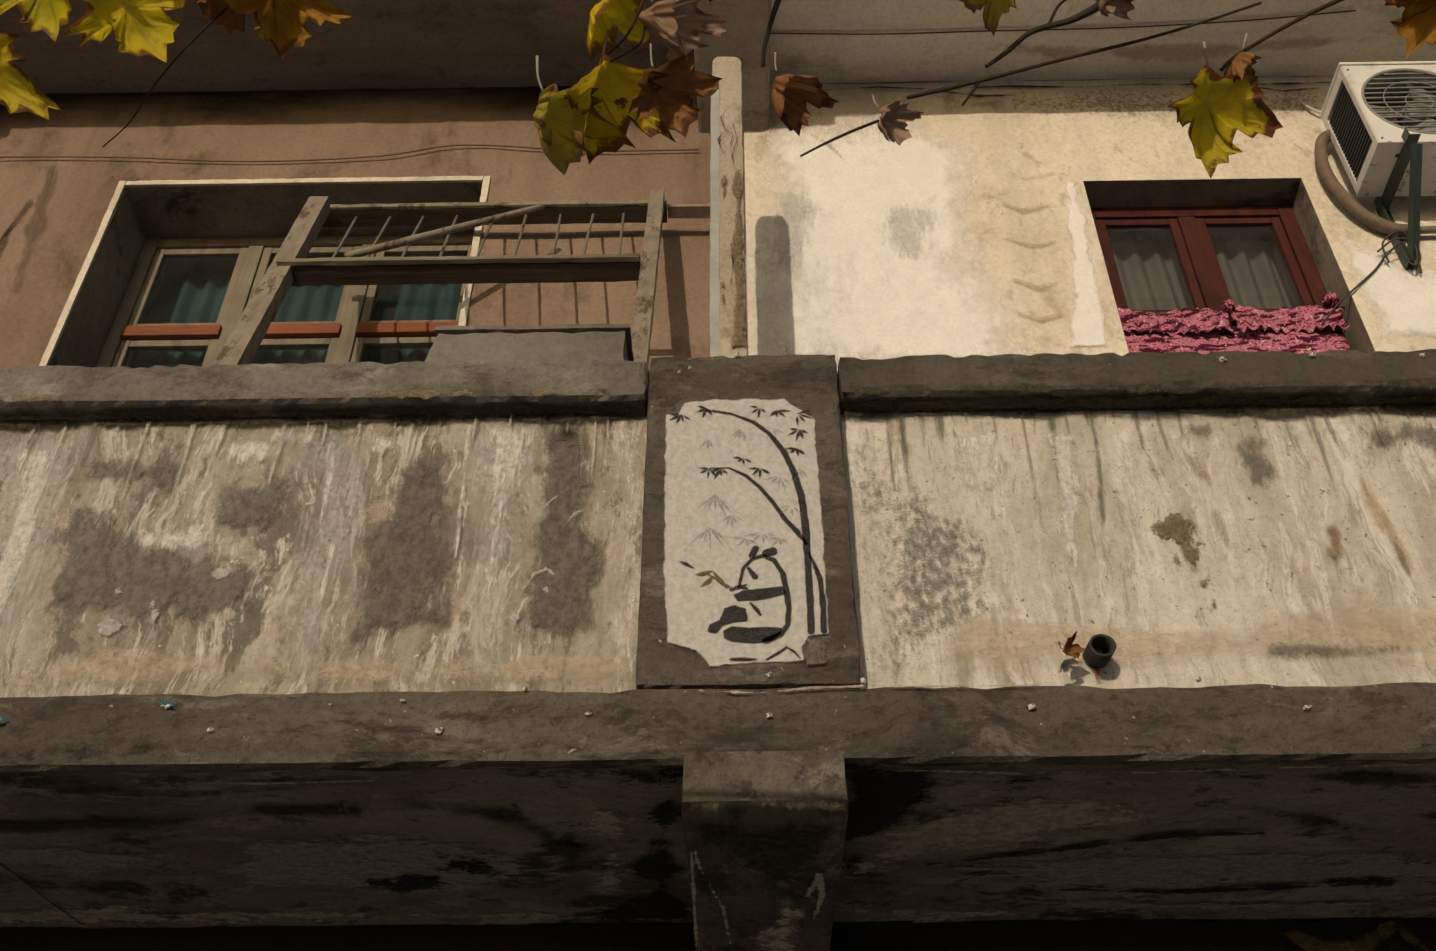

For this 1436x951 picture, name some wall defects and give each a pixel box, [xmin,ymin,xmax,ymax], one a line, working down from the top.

crack [0,203,28,242]
water stain [229,433,312,463]
water stain [372,438,393,458]
water stain [321,447,334,518]
water stain [53,480,292,623]
water stain [351,461,465,643]
water stain [484,423,603,633]
water stain [1277,764,1436,786]
crack [0,863,82,924]
water stain [0,905,371,928]
water stain [362,851,504,893]
water stain [452,764,1168,951]